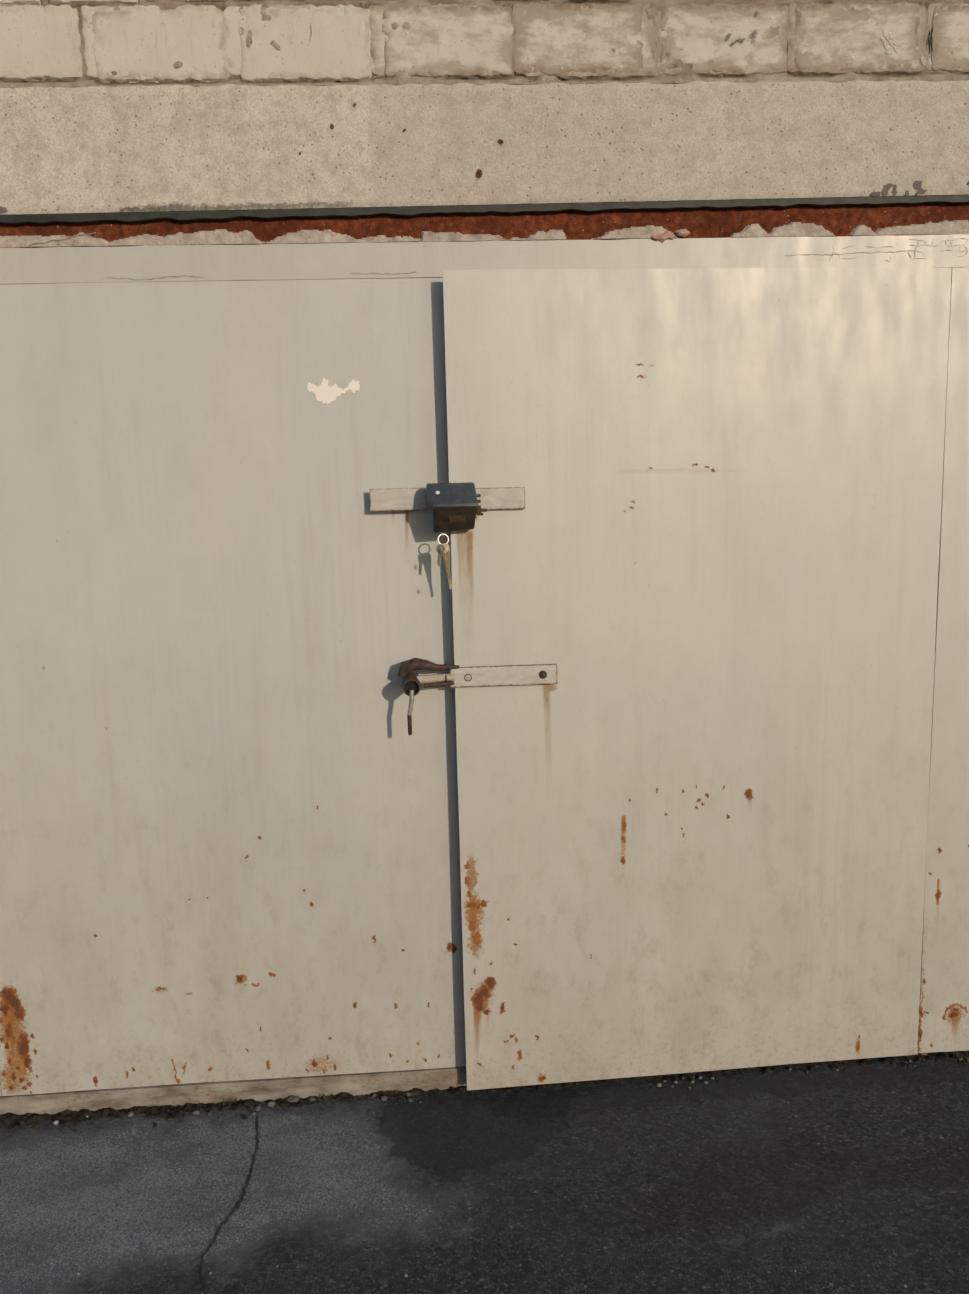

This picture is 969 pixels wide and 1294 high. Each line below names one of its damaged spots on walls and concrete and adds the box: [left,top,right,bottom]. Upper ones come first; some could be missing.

corrosion [621,799,631,864]
corrosion [447,861,506,1031]
corrosion [0,986,38,1094]
corrosion [917,979,968,1052]
crack [171,1116,260,1294]